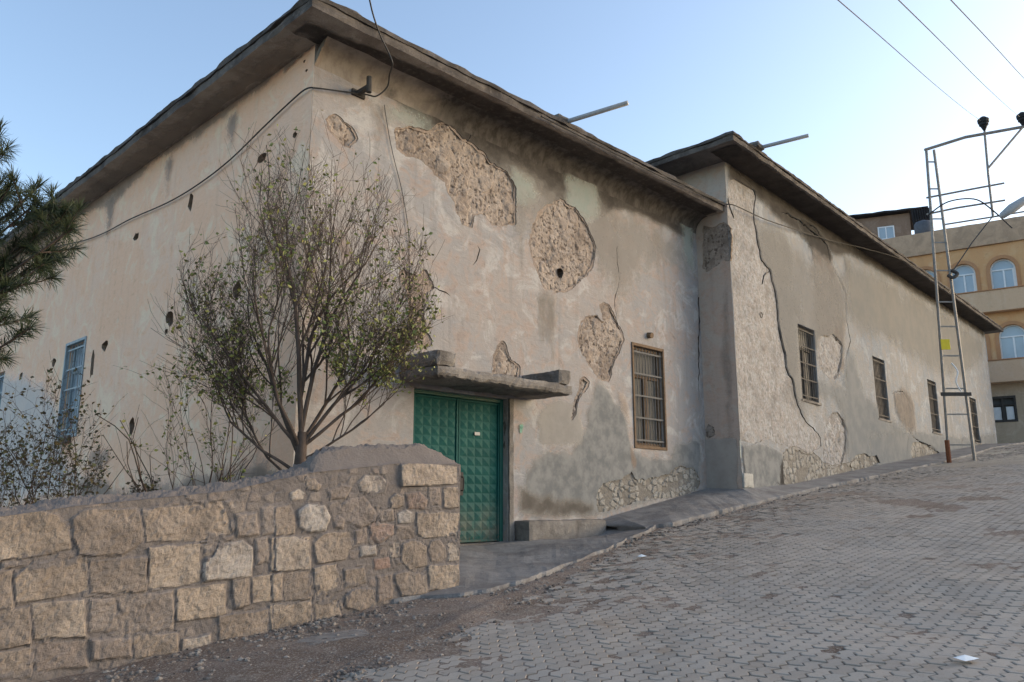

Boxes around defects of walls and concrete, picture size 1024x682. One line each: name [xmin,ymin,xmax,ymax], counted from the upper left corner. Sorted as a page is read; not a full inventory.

spalling [325,114,358,148]
spalling [394,122,517,228]
spalling [528,198,596,293]
spalling [492,341,521,378]
spalling [571,302,625,421]
peeling [702,179,846,468]
crack [728,189,821,443]
damp [521,490,593,516]